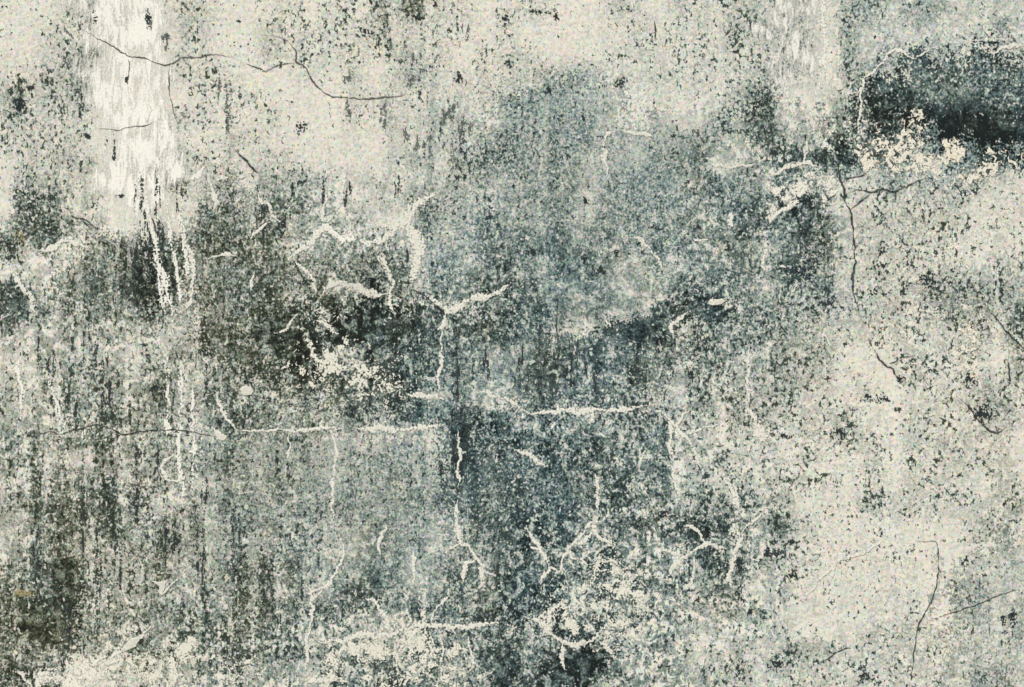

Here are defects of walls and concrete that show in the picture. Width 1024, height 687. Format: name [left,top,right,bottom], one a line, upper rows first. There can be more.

leakage [145,8,170,55]
crack [76,29,404,131]
leakage [0,184,88,313]
leakage [125,166,236,337]
crack [838,153,929,319]
leakage [13,354,26,422]
leakage [44,343,66,432]
leakage [99,352,115,426]
leakage [155,34,1024,680]
leakage [0,446,159,687]
crack [909,541,1016,686]